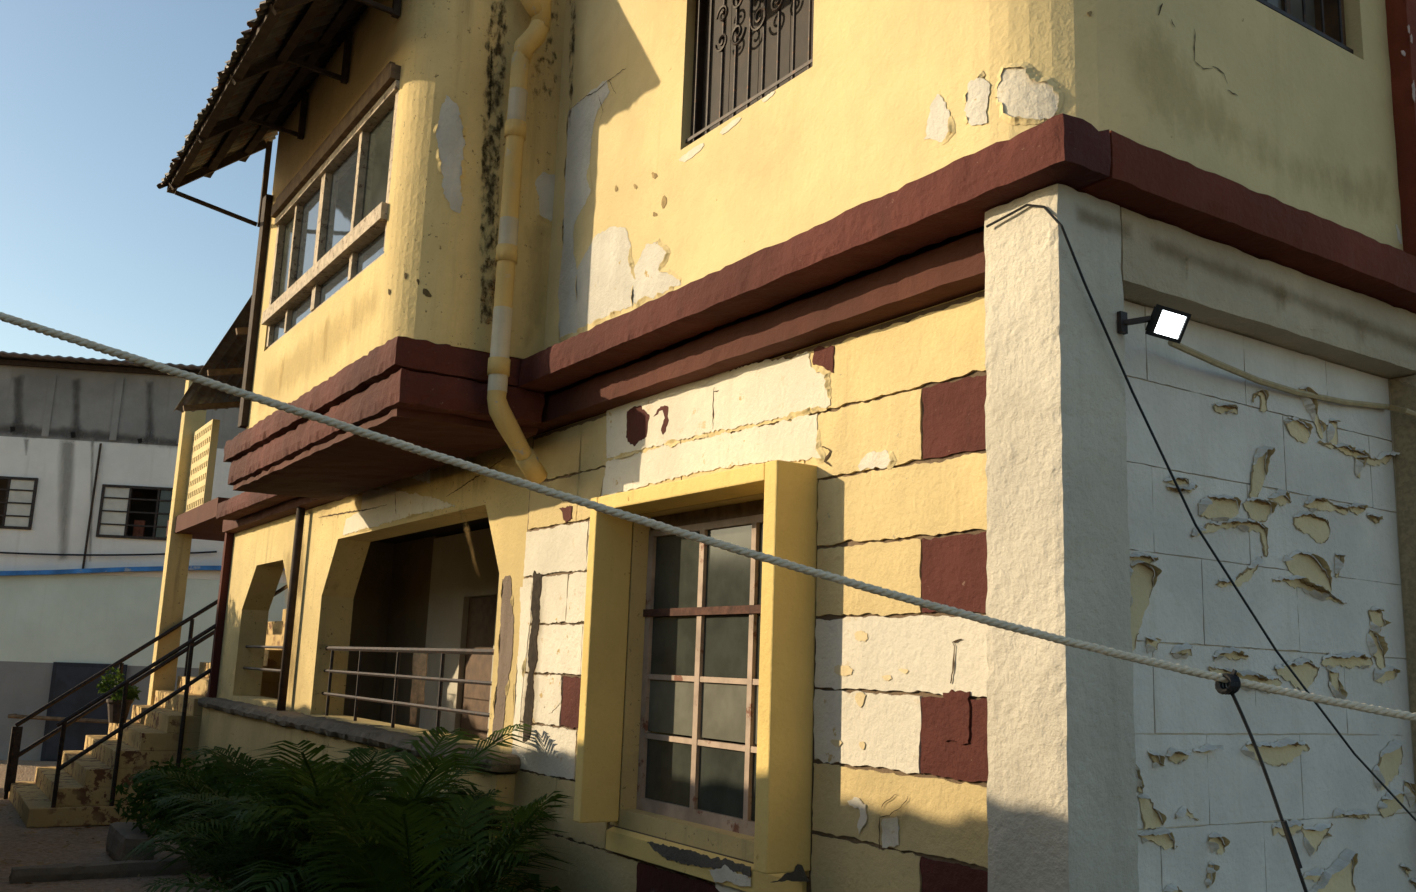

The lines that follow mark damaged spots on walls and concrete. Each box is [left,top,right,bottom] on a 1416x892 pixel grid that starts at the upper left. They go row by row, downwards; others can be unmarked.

crack [1158,3,1238,96]
leakage [480,4,506,288]
peeling [924,62,1064,145]
peeling [534,80,681,342]
leakage [0,378,178,554]
peeling [1284,385,1400,478]
peeling [1163,445,1384,605]
peeling [1129,552,1193,659]
peeling [1208,606,1401,699]
spalling [647,841,751,892]
peeling [1135,743,1224,850]
peeling [1271,739,1416,892]